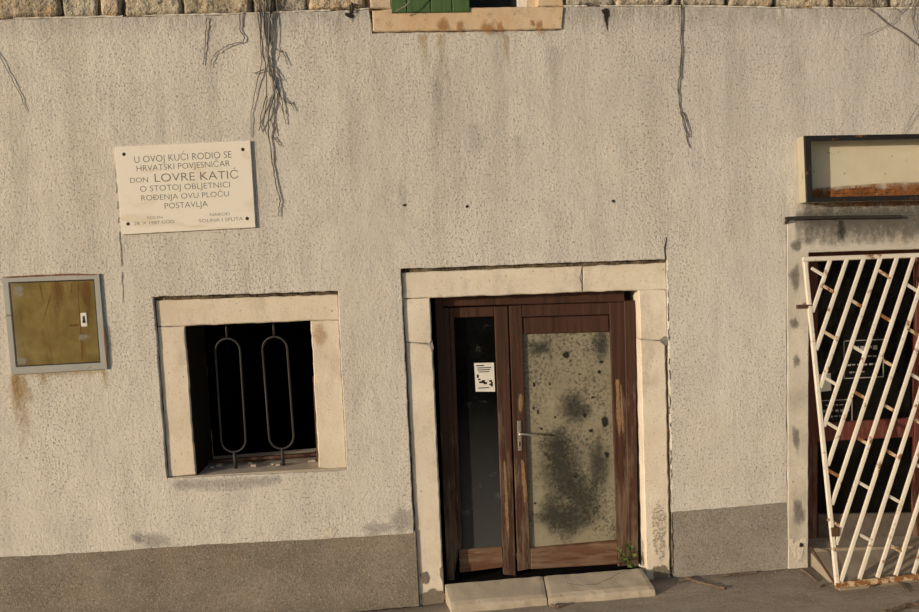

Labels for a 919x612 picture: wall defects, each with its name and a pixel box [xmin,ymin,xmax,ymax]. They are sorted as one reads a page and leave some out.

rust [12,376,24,406]